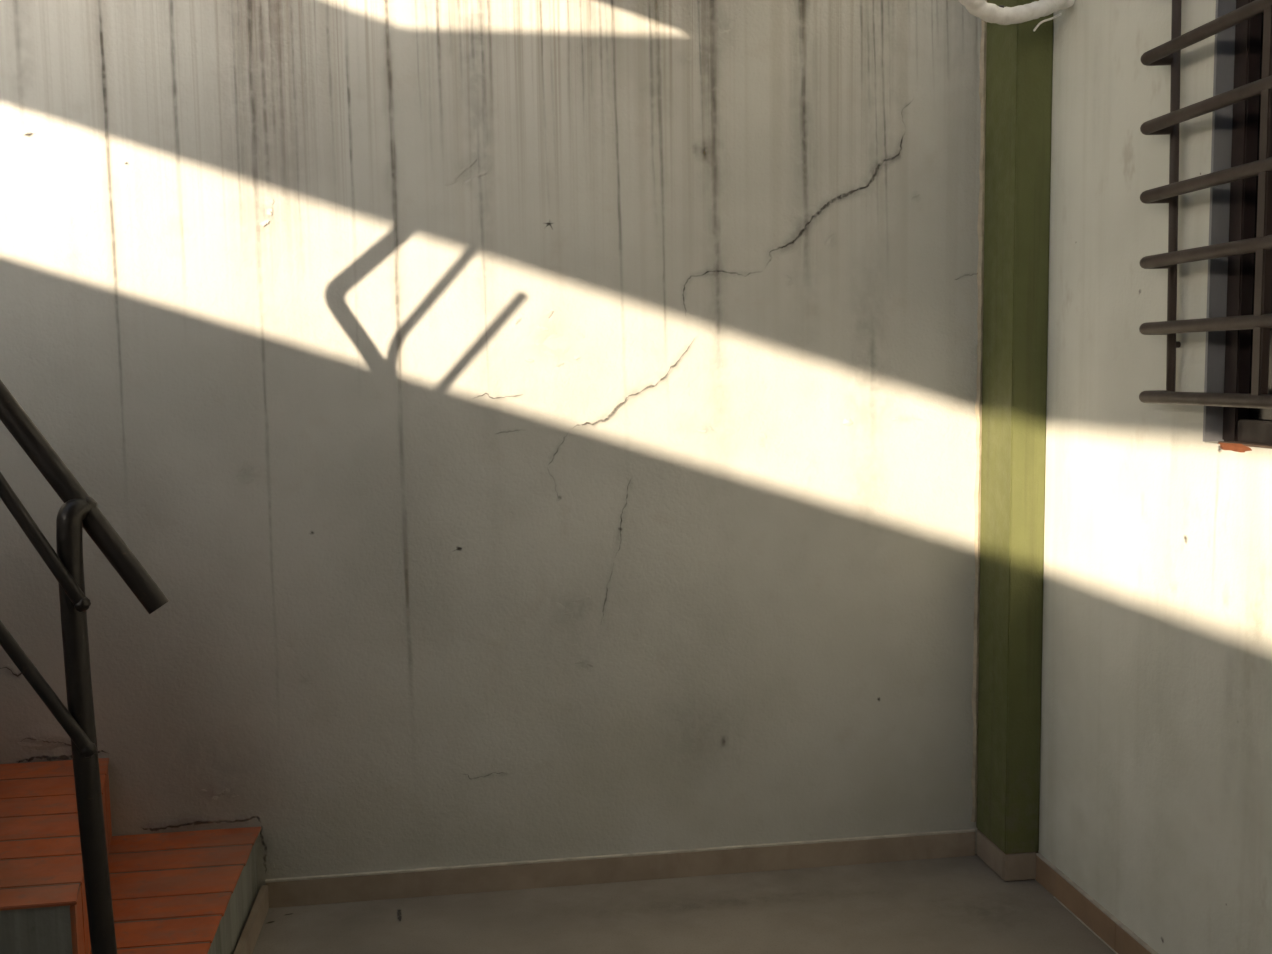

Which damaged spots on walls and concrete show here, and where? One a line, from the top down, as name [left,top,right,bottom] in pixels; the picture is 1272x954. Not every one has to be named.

crack [555,130,905,454]